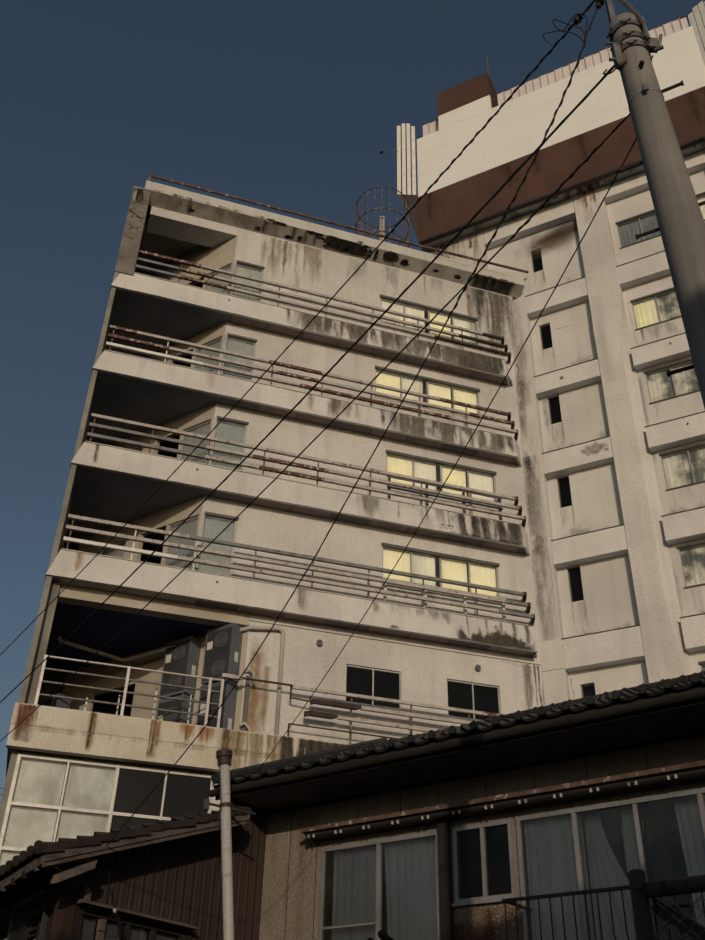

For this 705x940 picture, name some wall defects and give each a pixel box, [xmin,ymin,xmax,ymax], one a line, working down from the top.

water stain [302,313,503,374]
water stain [382,413,513,452]
water stain [458,514,523,545]
water stain [459,621,532,650]
rust [14,703,36,740]
rust [149,719,161,753]
rust [182,659,278,768]